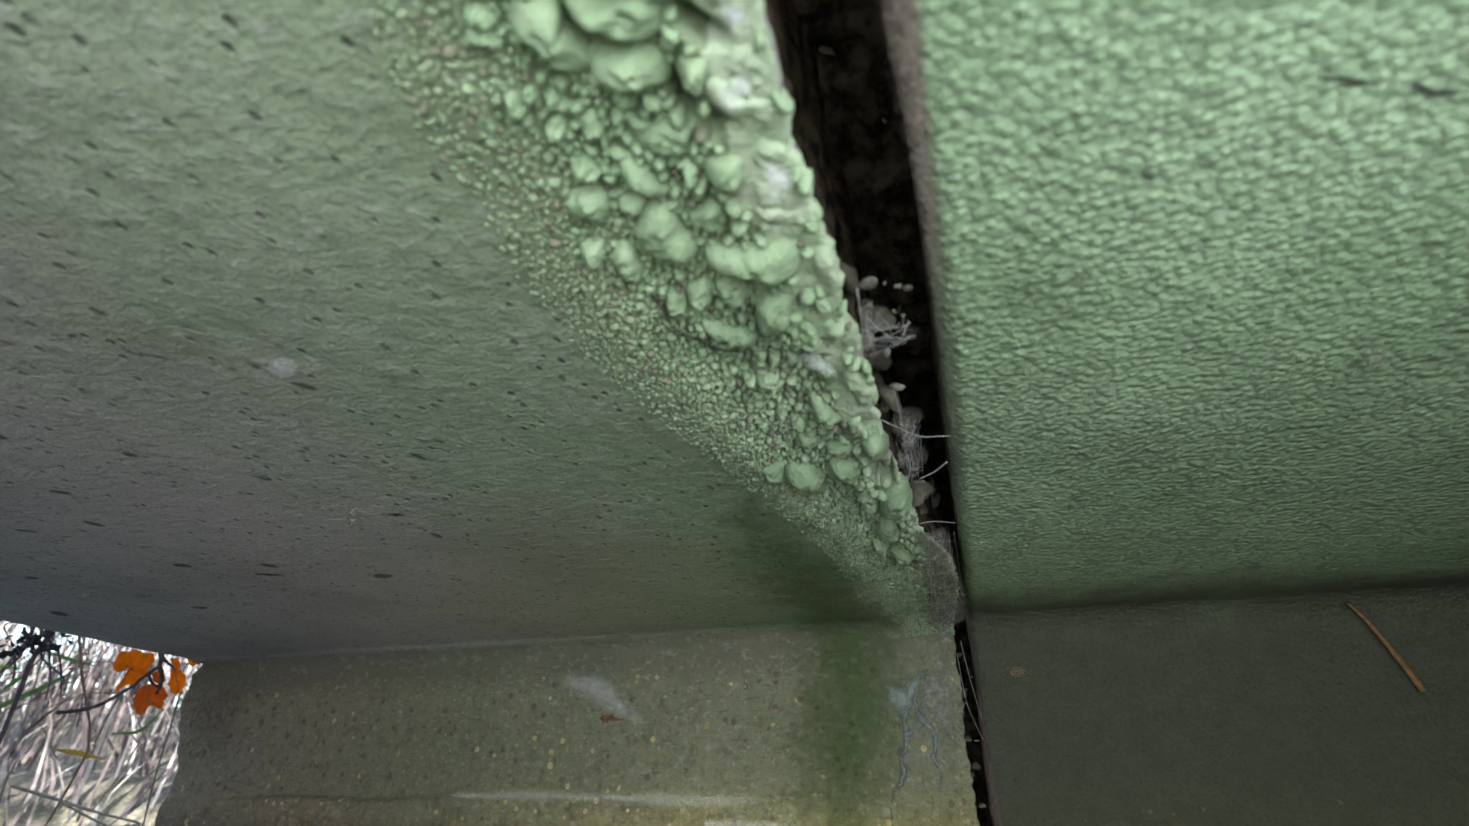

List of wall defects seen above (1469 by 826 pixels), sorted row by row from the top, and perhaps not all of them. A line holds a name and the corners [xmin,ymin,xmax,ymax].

crack [890,670,942,819]